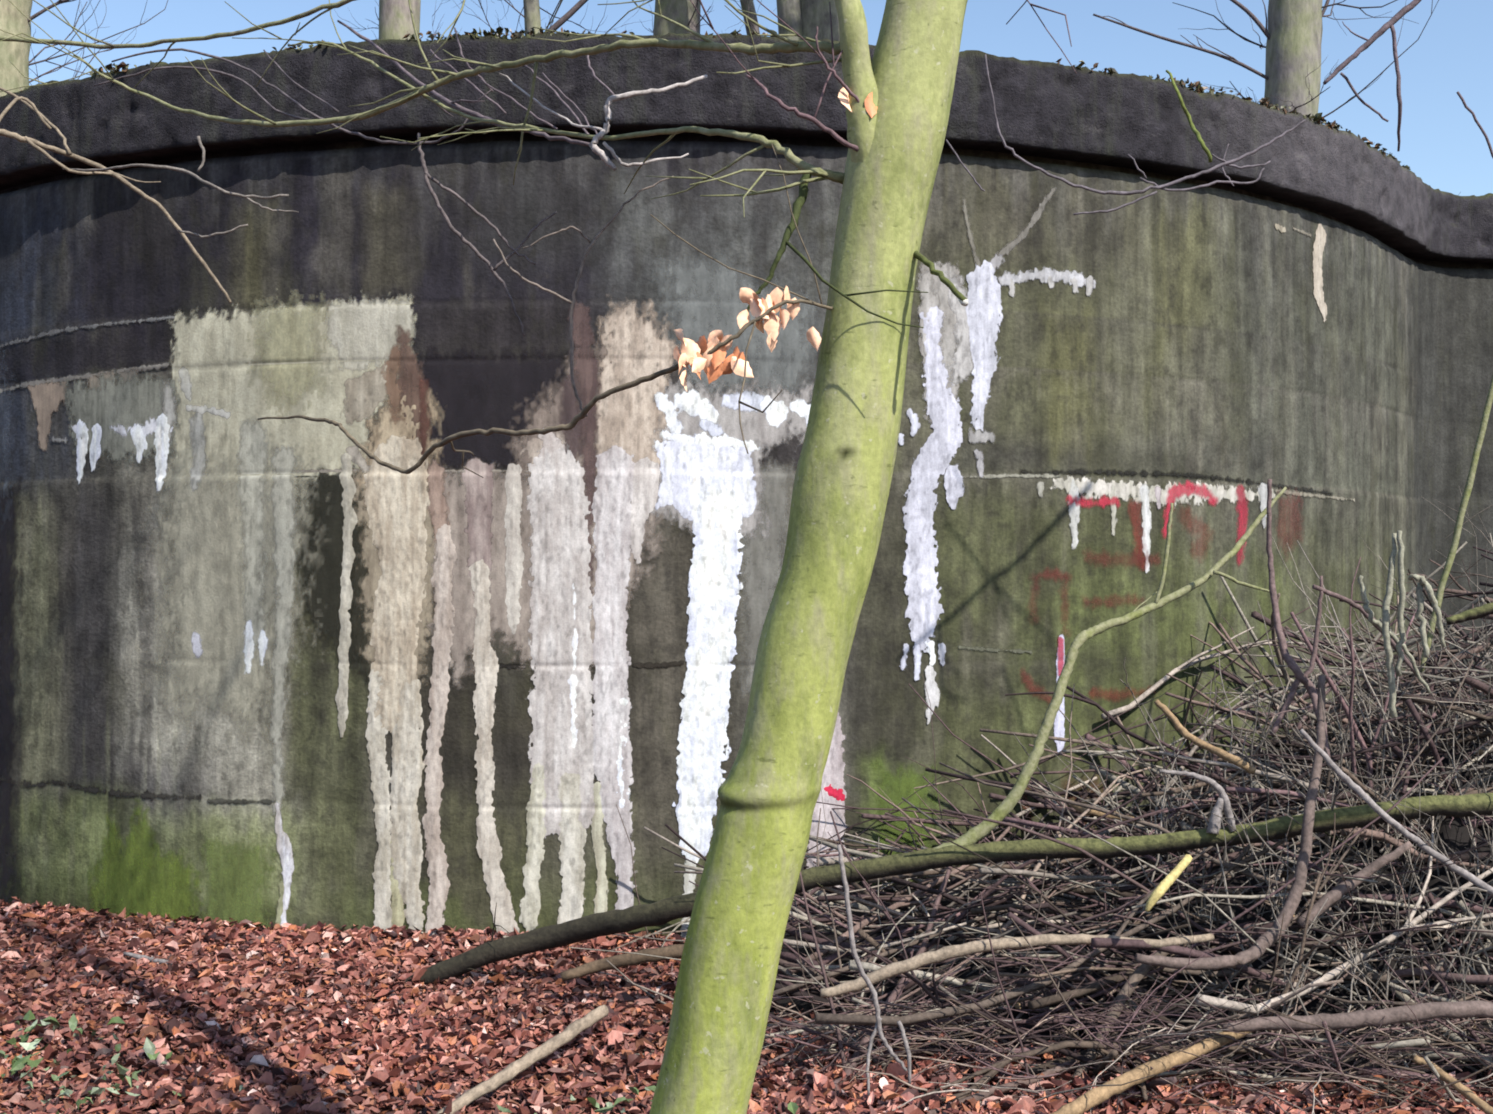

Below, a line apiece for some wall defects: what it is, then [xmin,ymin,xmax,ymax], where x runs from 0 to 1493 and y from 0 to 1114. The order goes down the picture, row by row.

water stain [0,316,174,347]
rust [381,326,430,455]
peeling [154,296,416,741]
water stain [626,258,815,691]
water stain [1037,476,1275,573]
water stain [0,363,383,928]
water stain [1054,635,1065,752]